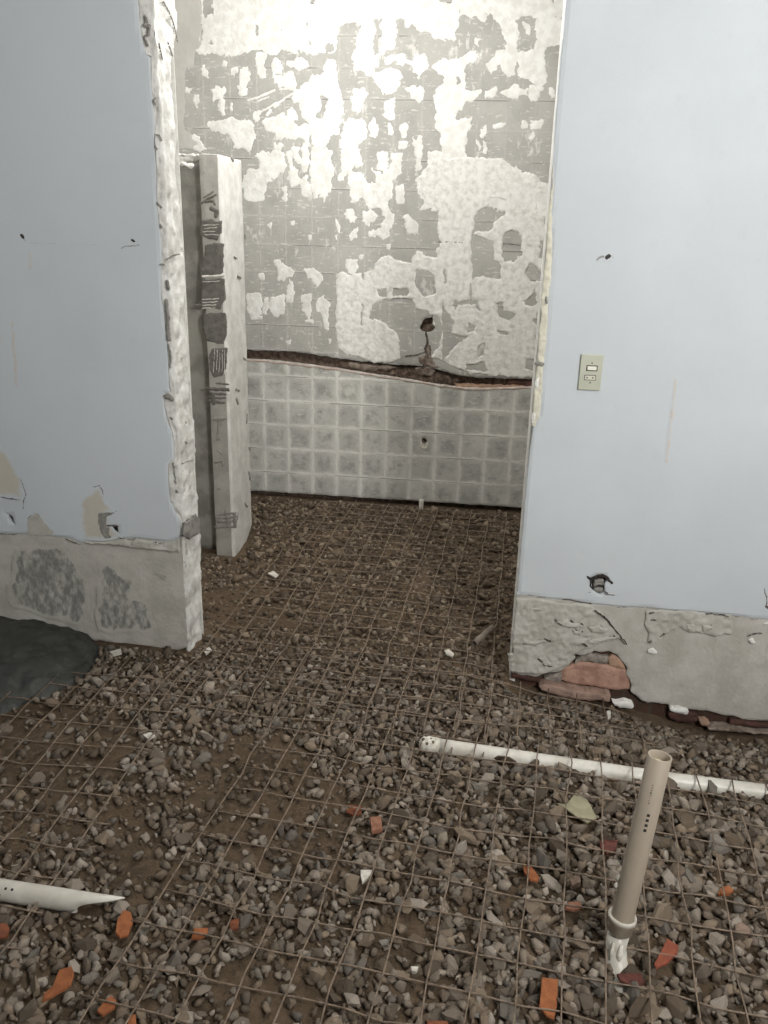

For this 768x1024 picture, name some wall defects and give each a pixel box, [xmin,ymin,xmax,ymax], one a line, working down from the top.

flaking render [66,0,563,655]
peeling [0,448,53,535]
flaking render [510,574,634,719]
flaking render [645,609,733,654]
flaking render [667,705,768,734]